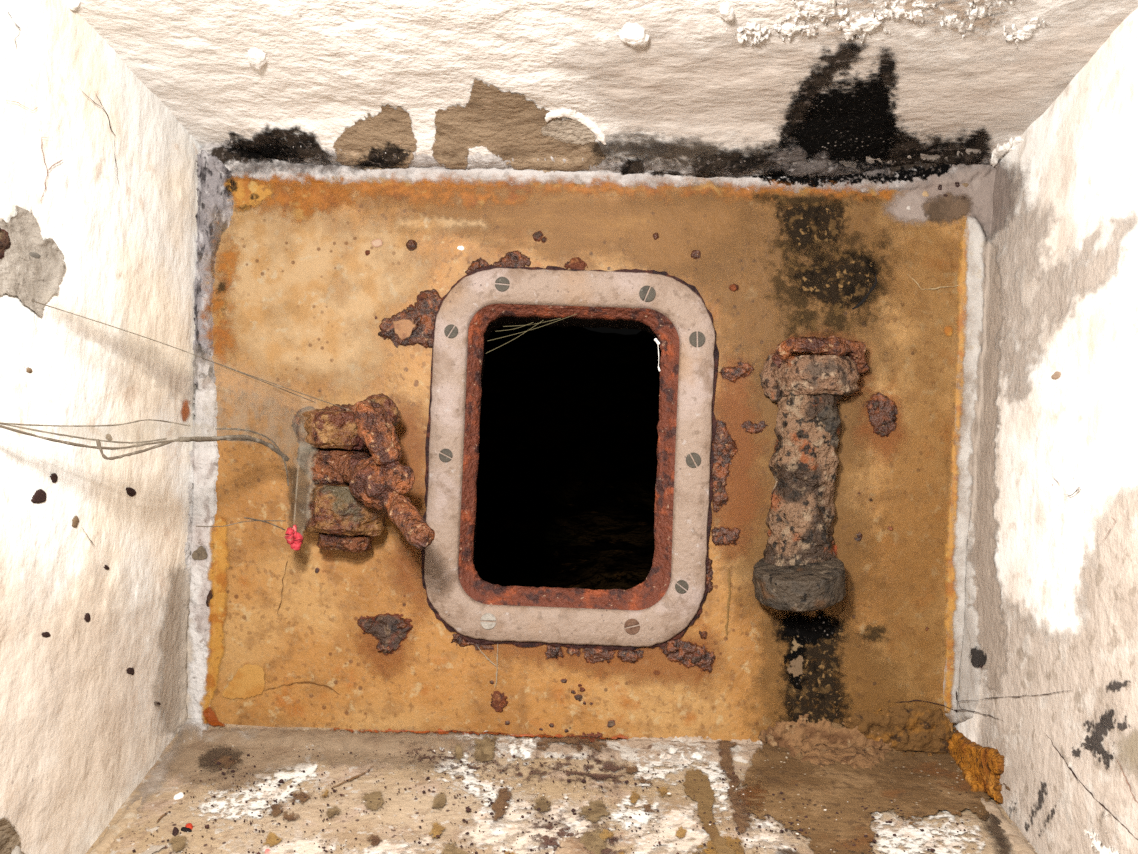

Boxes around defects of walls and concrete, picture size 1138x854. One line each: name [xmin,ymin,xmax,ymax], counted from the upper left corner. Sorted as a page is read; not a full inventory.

damp [585,0,1129,178]
damp [210,126,360,176]
peeling [333,104,417,170]
peeling [432,79,607,173]
flaking render [0,205,66,317]
rust [375,250,783,674]
damp [683,166,1138,854]
rust [357,613,413,655]
damp [625,766,668,812]
flaking render [0,818,25,854]
damp [579,800,614,854]